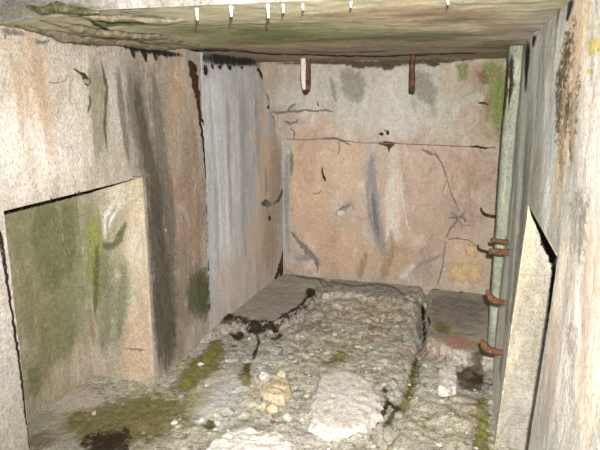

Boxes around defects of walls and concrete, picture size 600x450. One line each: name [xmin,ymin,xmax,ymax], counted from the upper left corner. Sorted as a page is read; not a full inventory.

crack [0,231,30,449]
water stain [91,203,117,311]
water stain [117,73,178,368]
crack [183,48,476,210]
crack [275,232,431,352]
crack [267,95,496,292]
water stain [367,162,408,262]